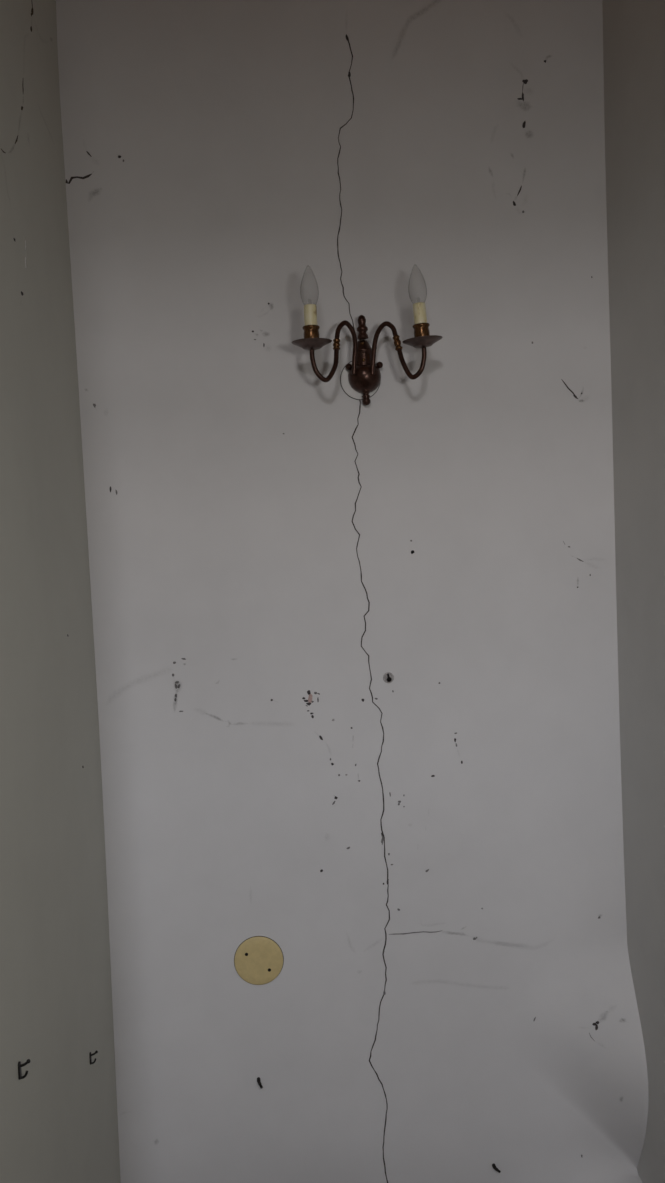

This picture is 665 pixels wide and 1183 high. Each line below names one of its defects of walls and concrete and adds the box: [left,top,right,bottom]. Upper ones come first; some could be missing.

crack [337,34,355,330]
crack [319,400,440,1183]